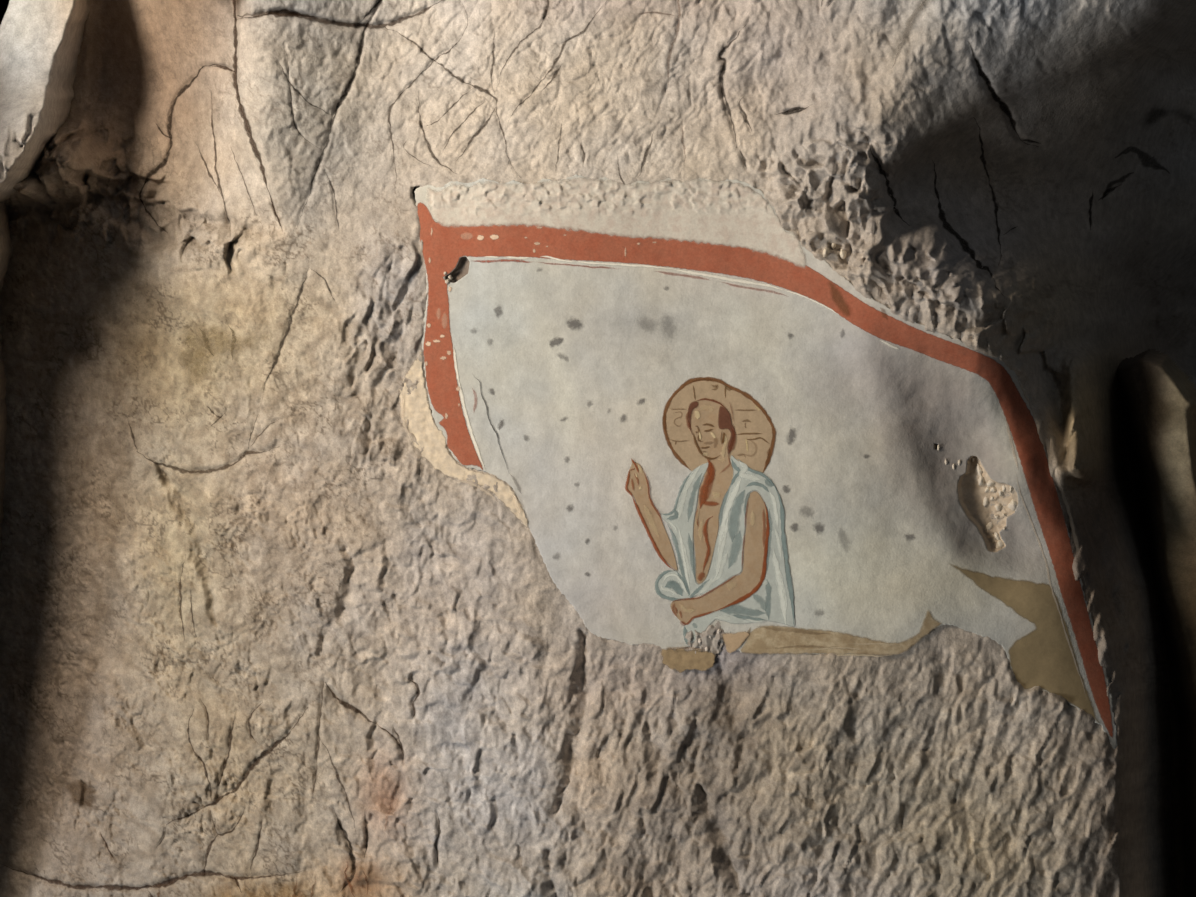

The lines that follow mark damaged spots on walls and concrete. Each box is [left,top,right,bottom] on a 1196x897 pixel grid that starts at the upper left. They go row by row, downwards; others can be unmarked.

spalling [444,256,470,291]
peeling [399,323,528,527]
spalling [934,444,1018,552]
peeling [661,622,749,673]